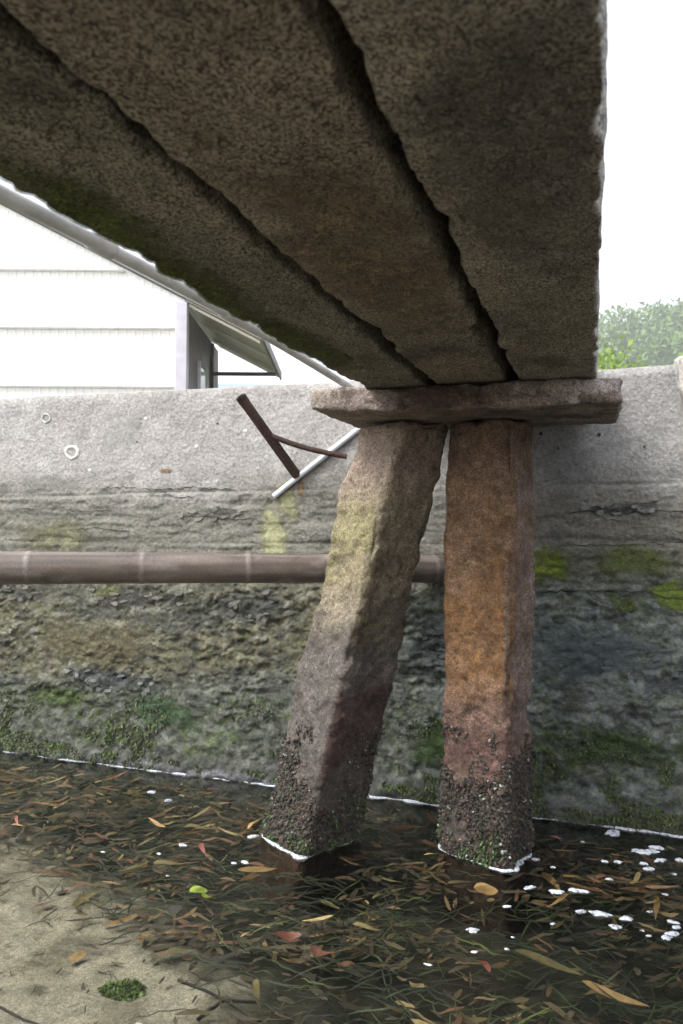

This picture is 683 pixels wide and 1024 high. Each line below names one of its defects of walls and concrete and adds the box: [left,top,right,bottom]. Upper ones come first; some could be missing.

crack [538,501,683,553]